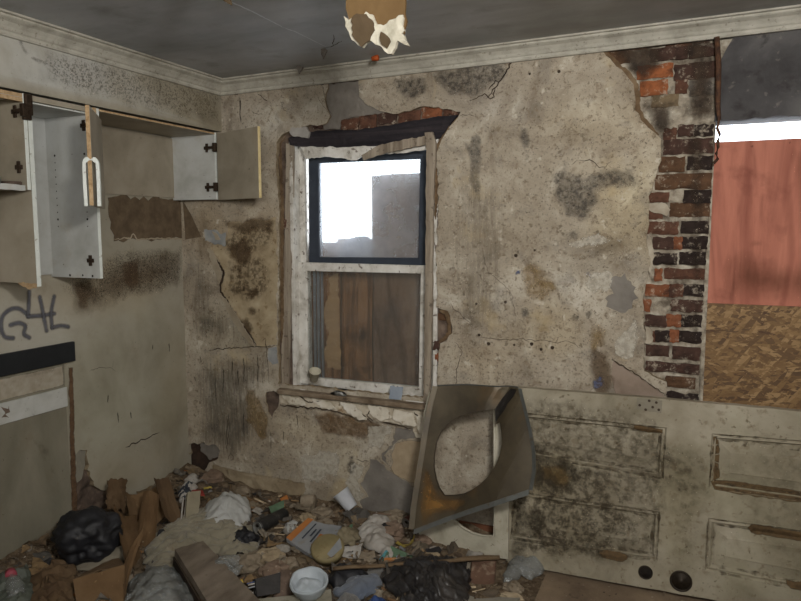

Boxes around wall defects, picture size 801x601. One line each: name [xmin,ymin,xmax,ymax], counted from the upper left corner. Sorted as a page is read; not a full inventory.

spalling [303,80,460,151]
water stain [233,220,272,231]
peeling [569,233,606,248]
water stain [556,172,633,217]
flaking render [586,37,733,401]
spalling [189,131,424,515]
spalling [432,308,452,361]